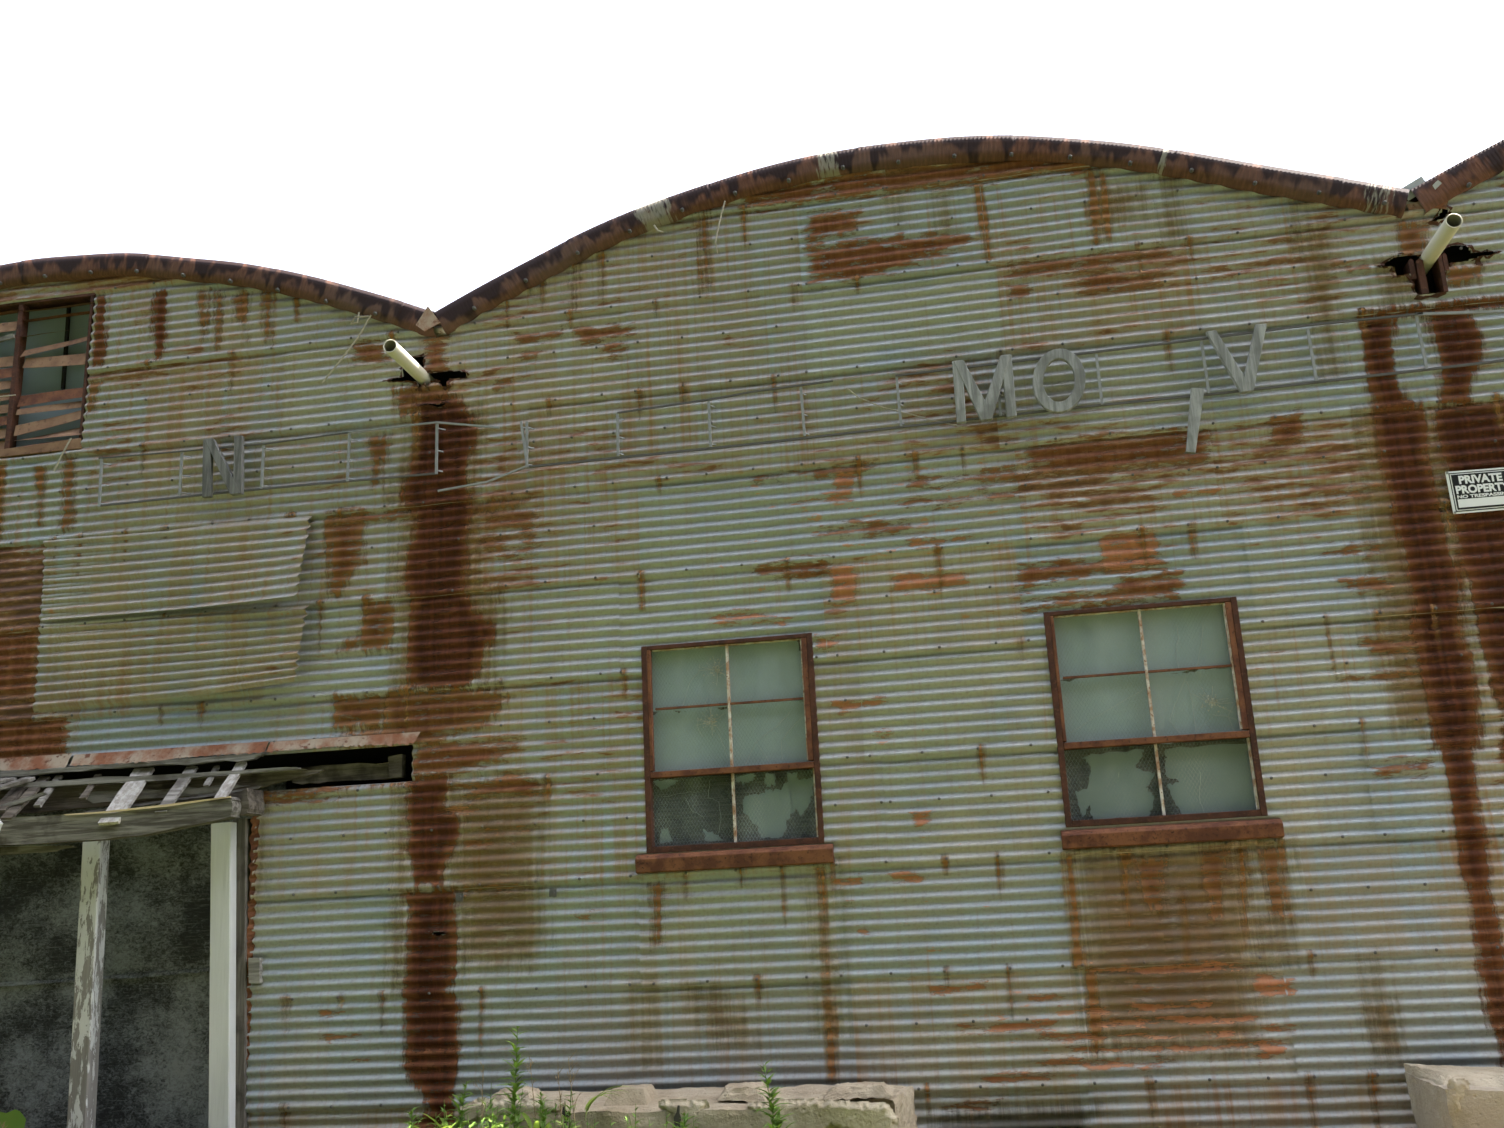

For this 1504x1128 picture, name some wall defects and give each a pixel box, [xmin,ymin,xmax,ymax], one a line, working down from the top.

rust [86,295,109,414]
rust [144,289,168,370]
rust [197,289,300,391]
rust [505,251,636,360]
rust [696,209,712,294]
rust [739,160,1193,304]
rust [1264,409,1305,452]
rust [1013,522,1198,613]
rust [0,618,71,759]
rust [246,330,542,1128]
rust [1296,220,1504,1067]
rust [1061,840,1292,1053]